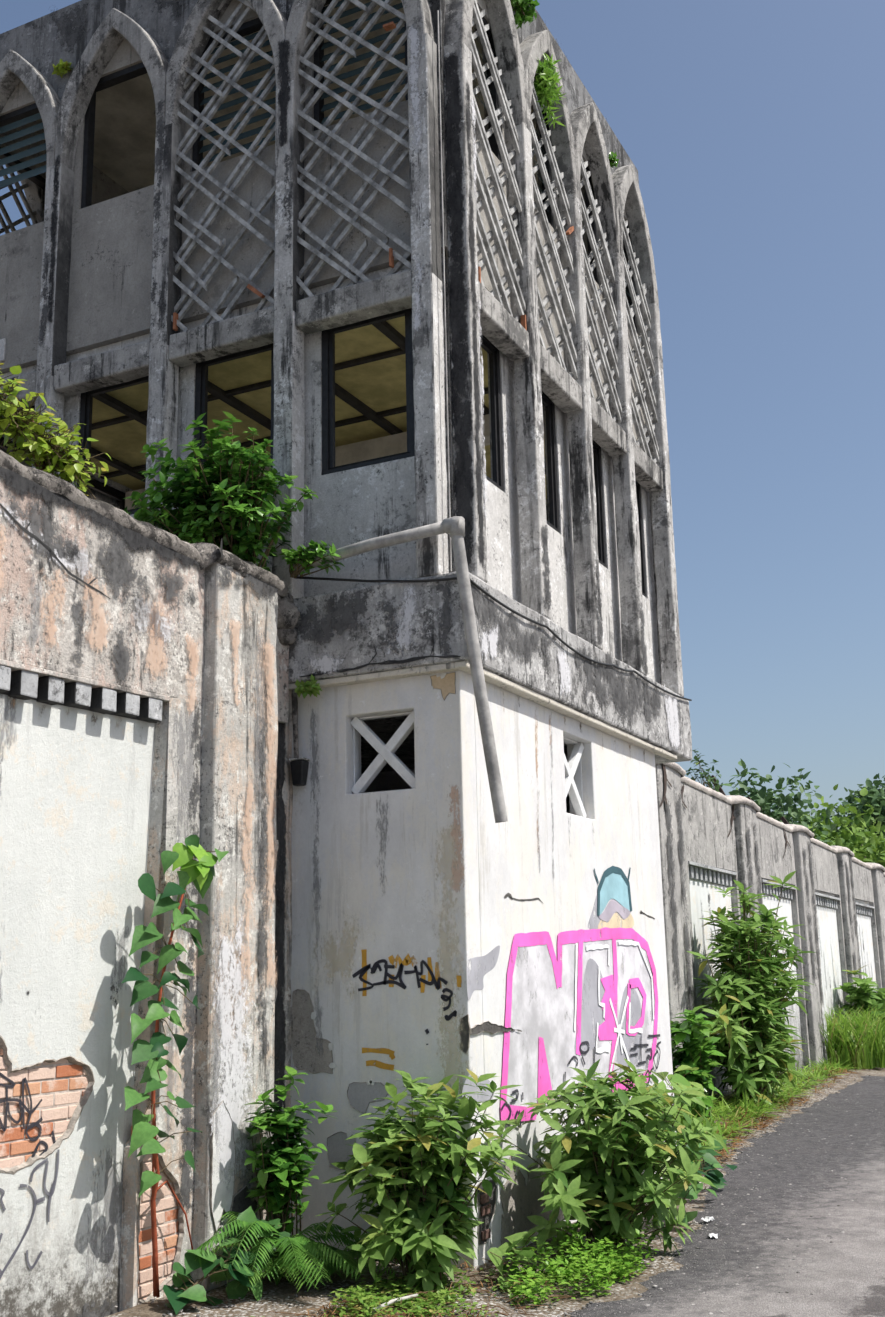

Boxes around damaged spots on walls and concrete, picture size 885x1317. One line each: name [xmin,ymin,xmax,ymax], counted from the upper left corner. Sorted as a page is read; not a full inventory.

water stain [408,0,487,657]
peeling [82,568,113,652]
water stain [0,467,201,683]
water stain [218,564,280,599]
water stain [299,578,417,674]
peeling [430,672,456,701]
water stain [541,525,552,611]
water stain [470,571,683,750]
peeling [291,989,337,1074]
spalling [0,1035,95,1175]
spalling [137,1153,184,1305]
spalling [475,1156,565,1246]